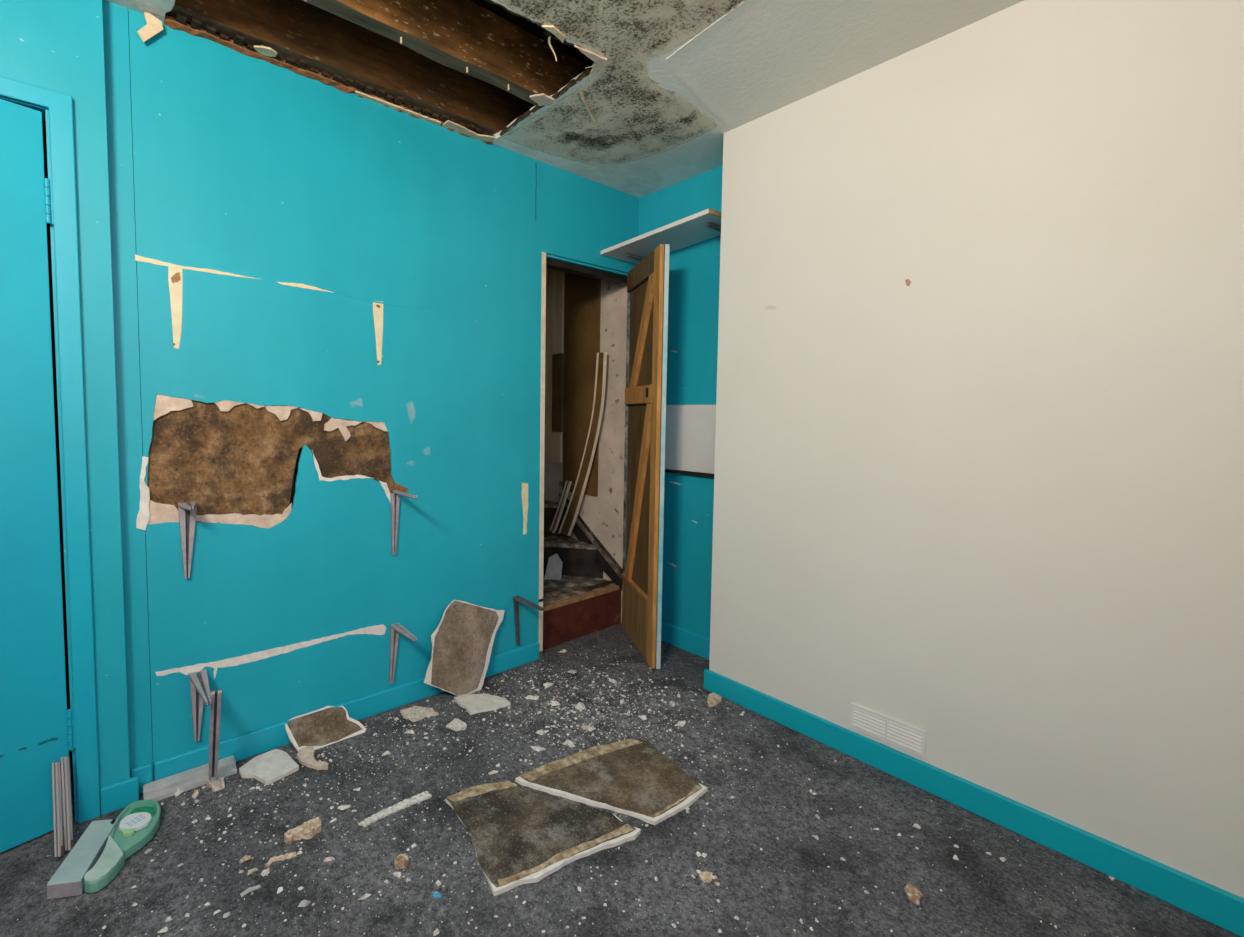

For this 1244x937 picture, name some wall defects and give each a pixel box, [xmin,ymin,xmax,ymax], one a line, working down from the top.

flaking render [542,25,607,75]
spalling [137,12,495,145]
flaking render [530,93,555,106]
water stain [508,0,742,162]
peeling [135,254,257,279]
peeling [278,282,441,310]
spalling [136,394,409,530]
peeling [155,624,386,679]